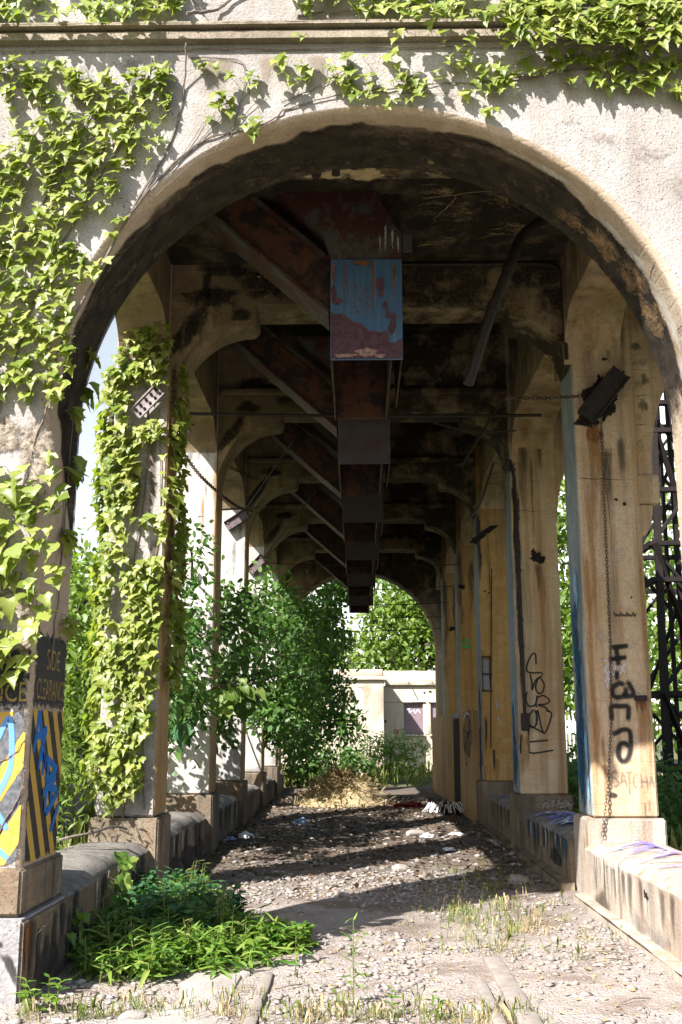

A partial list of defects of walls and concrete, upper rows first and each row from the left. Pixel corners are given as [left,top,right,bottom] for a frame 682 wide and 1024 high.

peeling [531,160,572,185]
rust [334,347,386,358]
peeling [562,214,682,374]
leakage [500,438,541,691]
rust [584,425,602,620]
rust [593,714,606,777]